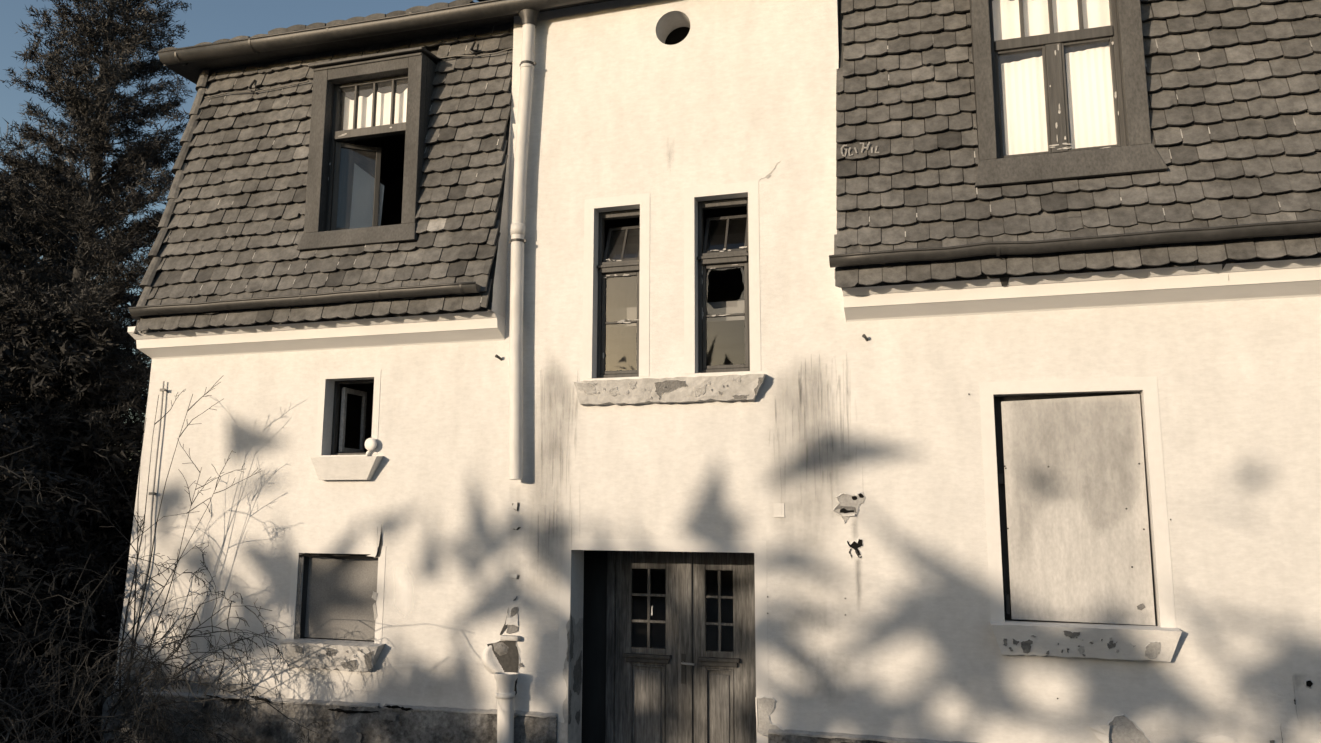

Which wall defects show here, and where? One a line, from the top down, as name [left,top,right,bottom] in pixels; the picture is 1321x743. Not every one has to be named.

peeling [280,524,382,671]
spalling [481,596,523,698]
peeling [558,613,583,743]
peeling [1003,630,1161,659]
spalling [1088,714,1150,743]